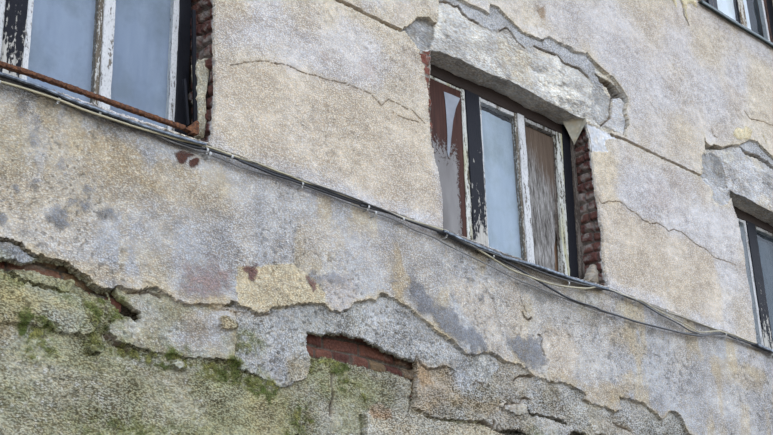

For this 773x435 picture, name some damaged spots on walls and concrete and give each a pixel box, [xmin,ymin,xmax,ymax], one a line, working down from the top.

corrosion [0,61,199,137]
flaking render [188,0,215,143]
crack [230,60,426,124]
corrosion [175,150,199,167]
flaking render [400,0,630,286]
flaking render [700,126,773,212]
crack [597,195,738,266]
flaking render [0,239,692,435]